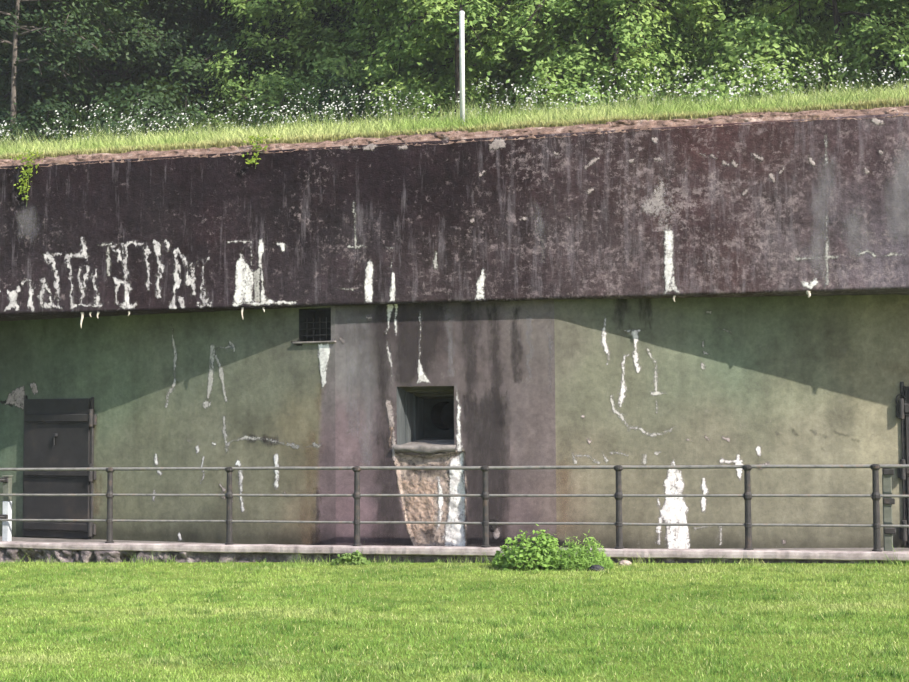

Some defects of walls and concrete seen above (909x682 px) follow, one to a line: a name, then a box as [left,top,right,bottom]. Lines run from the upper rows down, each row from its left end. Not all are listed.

damp [21,237,212,329]
damp [512,308,522,382]
peeling [5,382,38,410]
damp [463,269,508,545]
spalling [385,395,467,547]